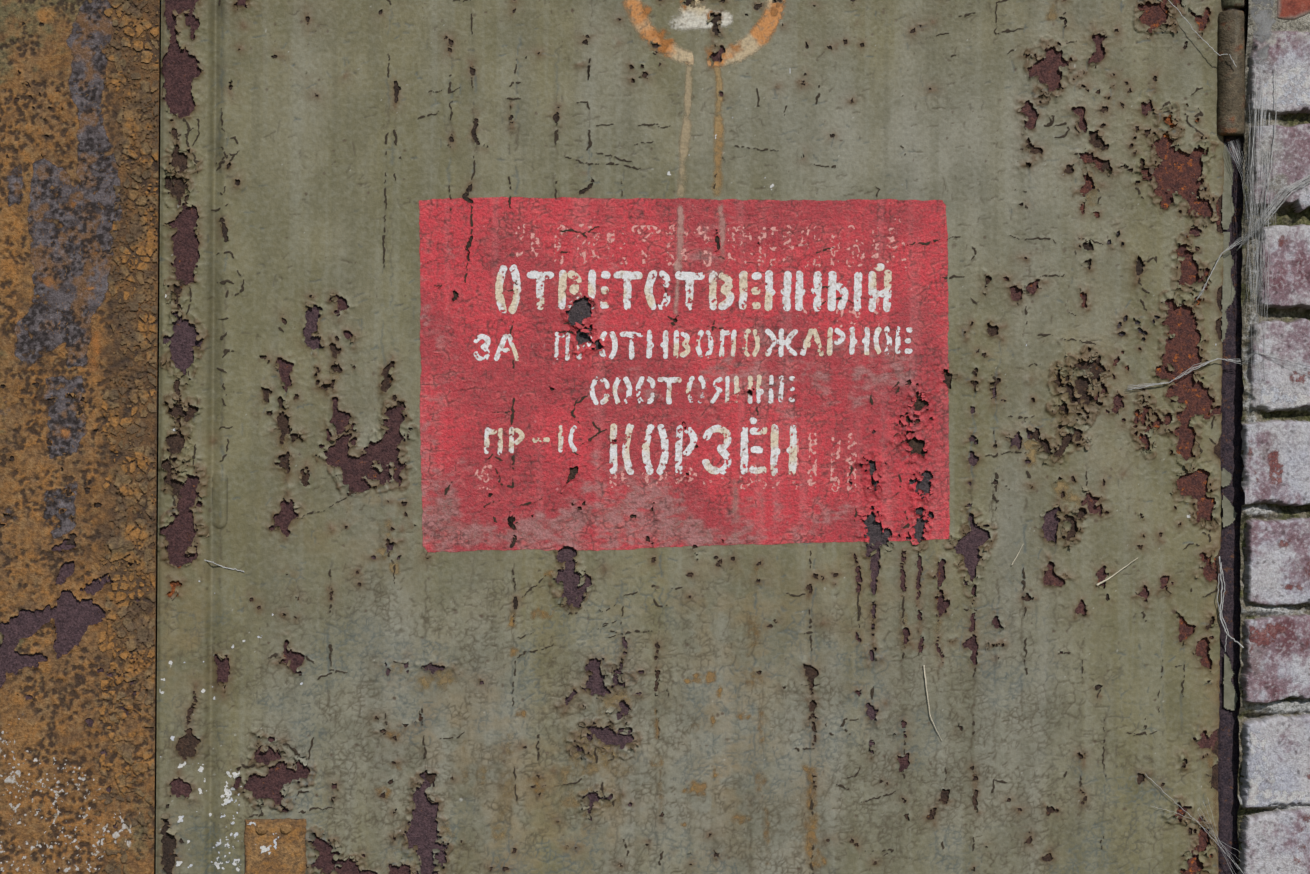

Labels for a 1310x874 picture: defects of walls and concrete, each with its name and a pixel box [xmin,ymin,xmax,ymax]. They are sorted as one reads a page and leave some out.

peeling [1138,0,1211,49]
peeling [0,0,122,689]
peeling [160,0,209,600]
peeling [259,292,416,537]
peeling [553,546,592,609]
peeling [849,379,935,557]
peeling [949,503,992,586]
peeling [1040,471,1109,589]
peeling [1006,29,1221,529]
peeling [565,606,644,763]
peeling [233,736,310,812]
peeling [306,770,462,874]